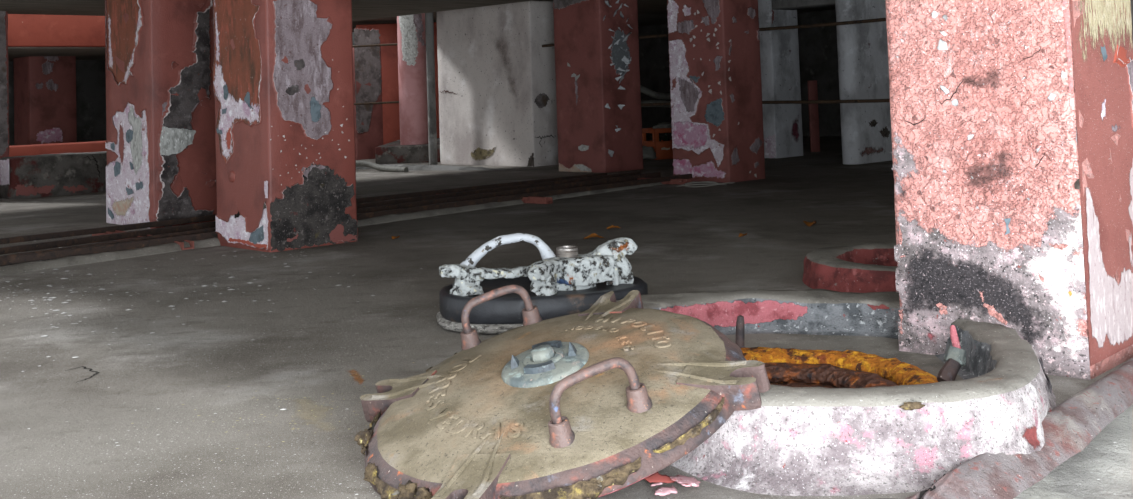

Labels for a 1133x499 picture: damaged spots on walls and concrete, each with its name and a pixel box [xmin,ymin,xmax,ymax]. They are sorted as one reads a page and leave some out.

peeling [105,0,382,251]
peeling [667,0,776,180]
peeling [869,120,920,195]
peeling [1073,0,1133,132]
water stain [903,213,1087,394]
peeling [867,162,1133,380]